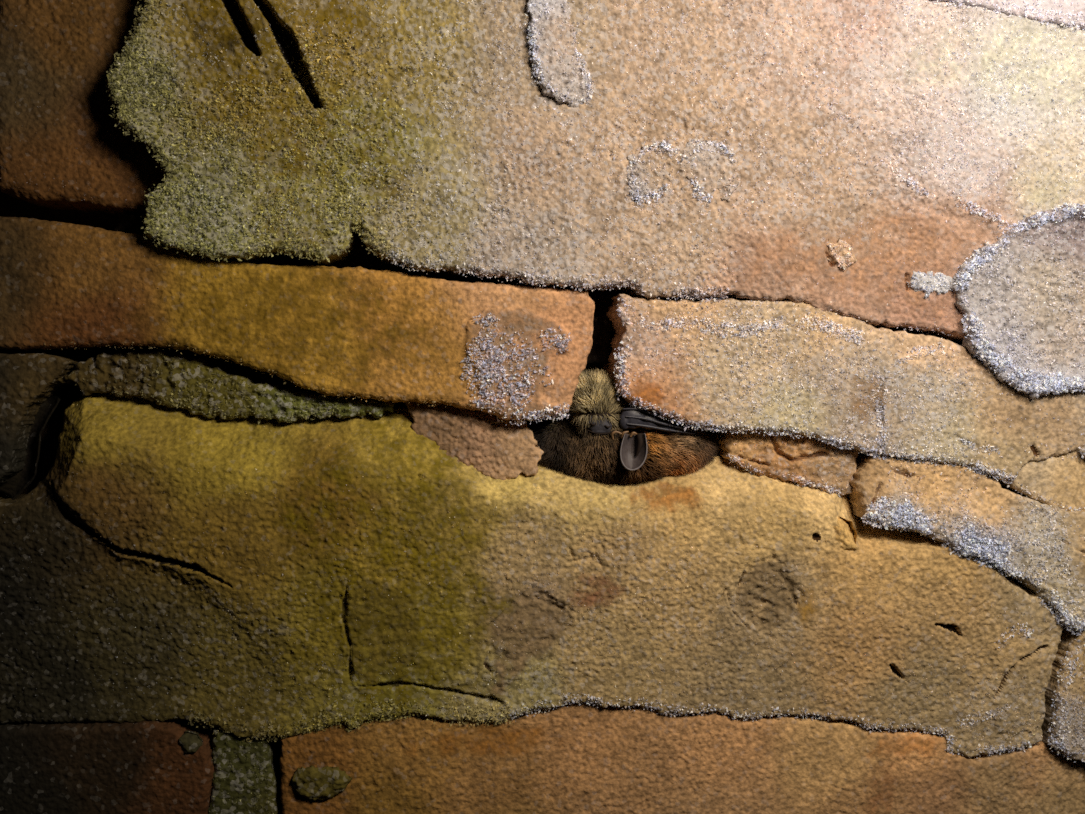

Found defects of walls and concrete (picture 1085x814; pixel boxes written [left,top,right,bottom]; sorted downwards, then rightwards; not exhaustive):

crack [221,0,323,109]
crack [0,347,316,393]
crack [356,396,407,409]
crack [0,392,231,586]